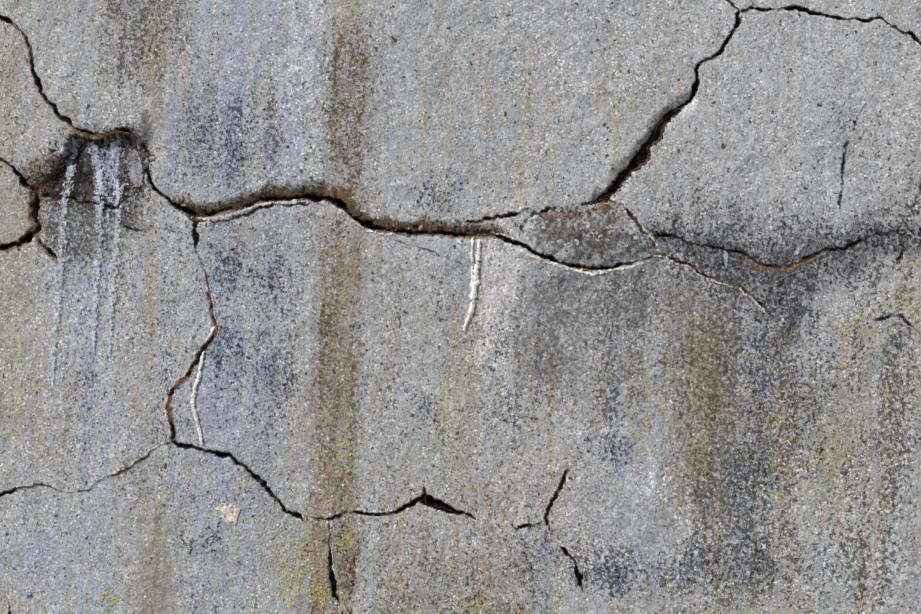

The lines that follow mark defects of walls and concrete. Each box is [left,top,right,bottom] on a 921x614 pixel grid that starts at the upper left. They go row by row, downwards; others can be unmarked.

crack [586,0,921,213]
crack [0,15,770,521]
damp [463,177,921,551]
crack [651,230,921,273]
crack [853,314,920,333]
crack [312,483,475,614]
crack [508,467,583,591]
damp [522,525,590,591]